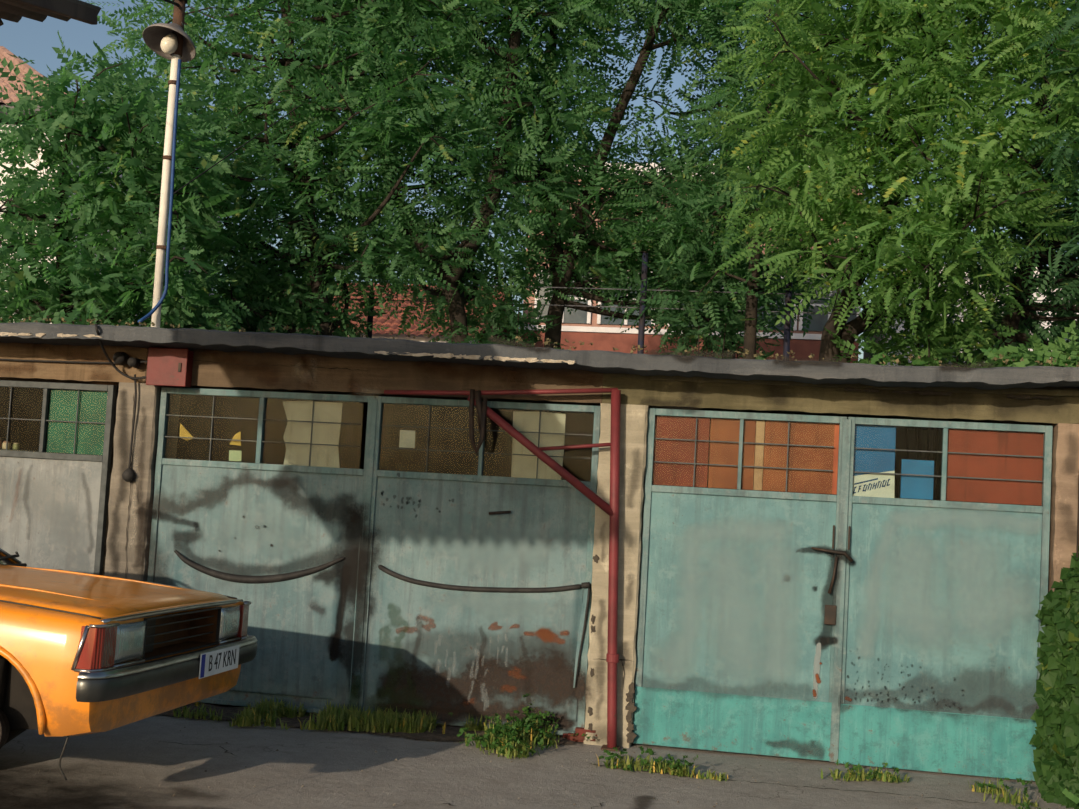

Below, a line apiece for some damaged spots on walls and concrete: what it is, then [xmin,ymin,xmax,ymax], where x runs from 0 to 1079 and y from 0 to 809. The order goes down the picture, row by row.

spalling [375,351,576,365]
rust [488,622,569,644]